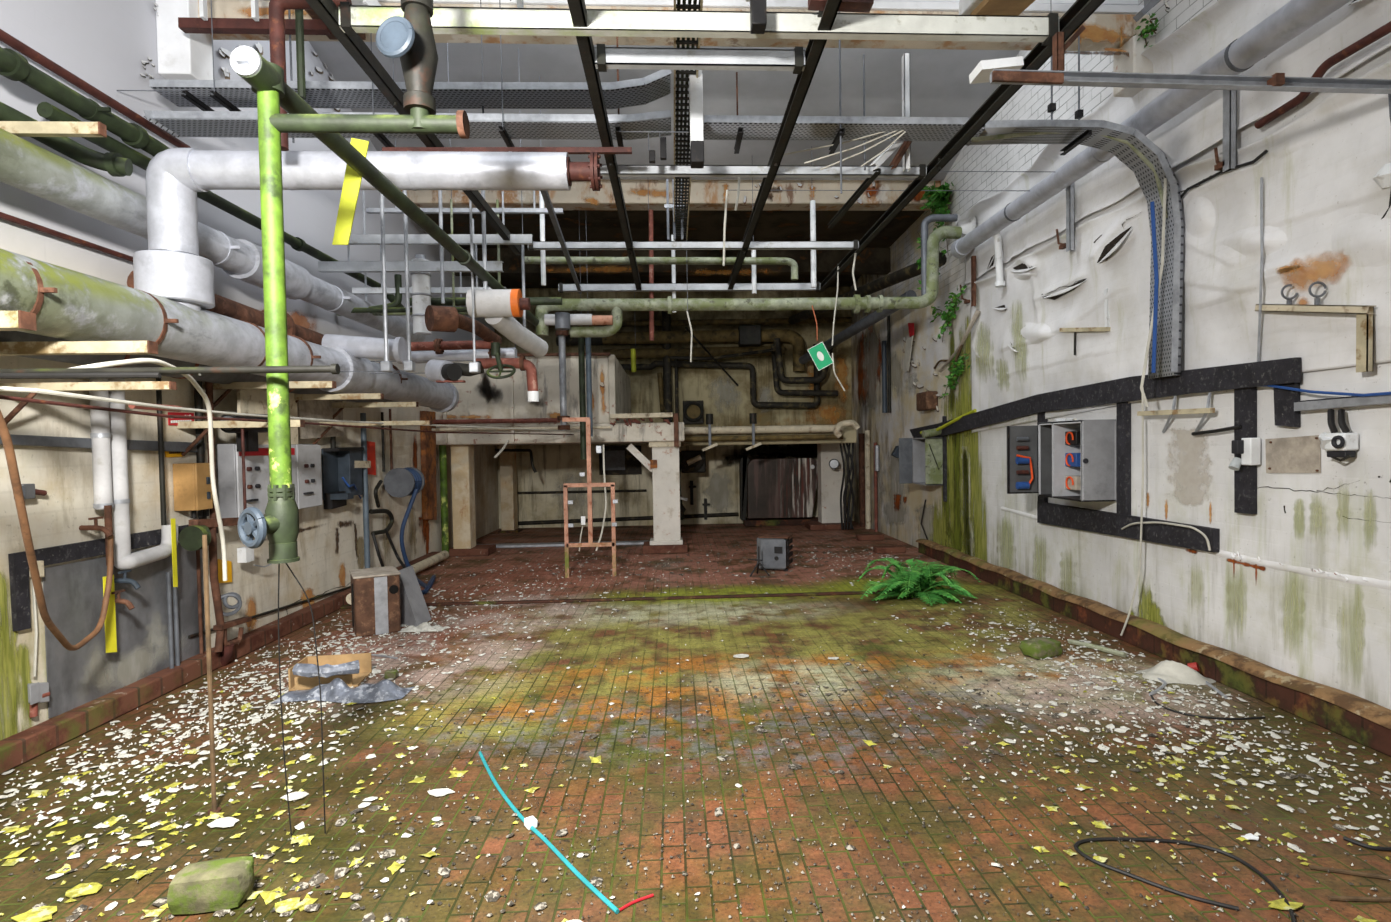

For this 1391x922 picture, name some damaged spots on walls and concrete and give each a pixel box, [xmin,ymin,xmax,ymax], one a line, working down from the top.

corrosion [632,189,666,197]
corrosion [1280,257,1347,305]
leakage [877,318,987,562]
leakage [0,573,32,727]